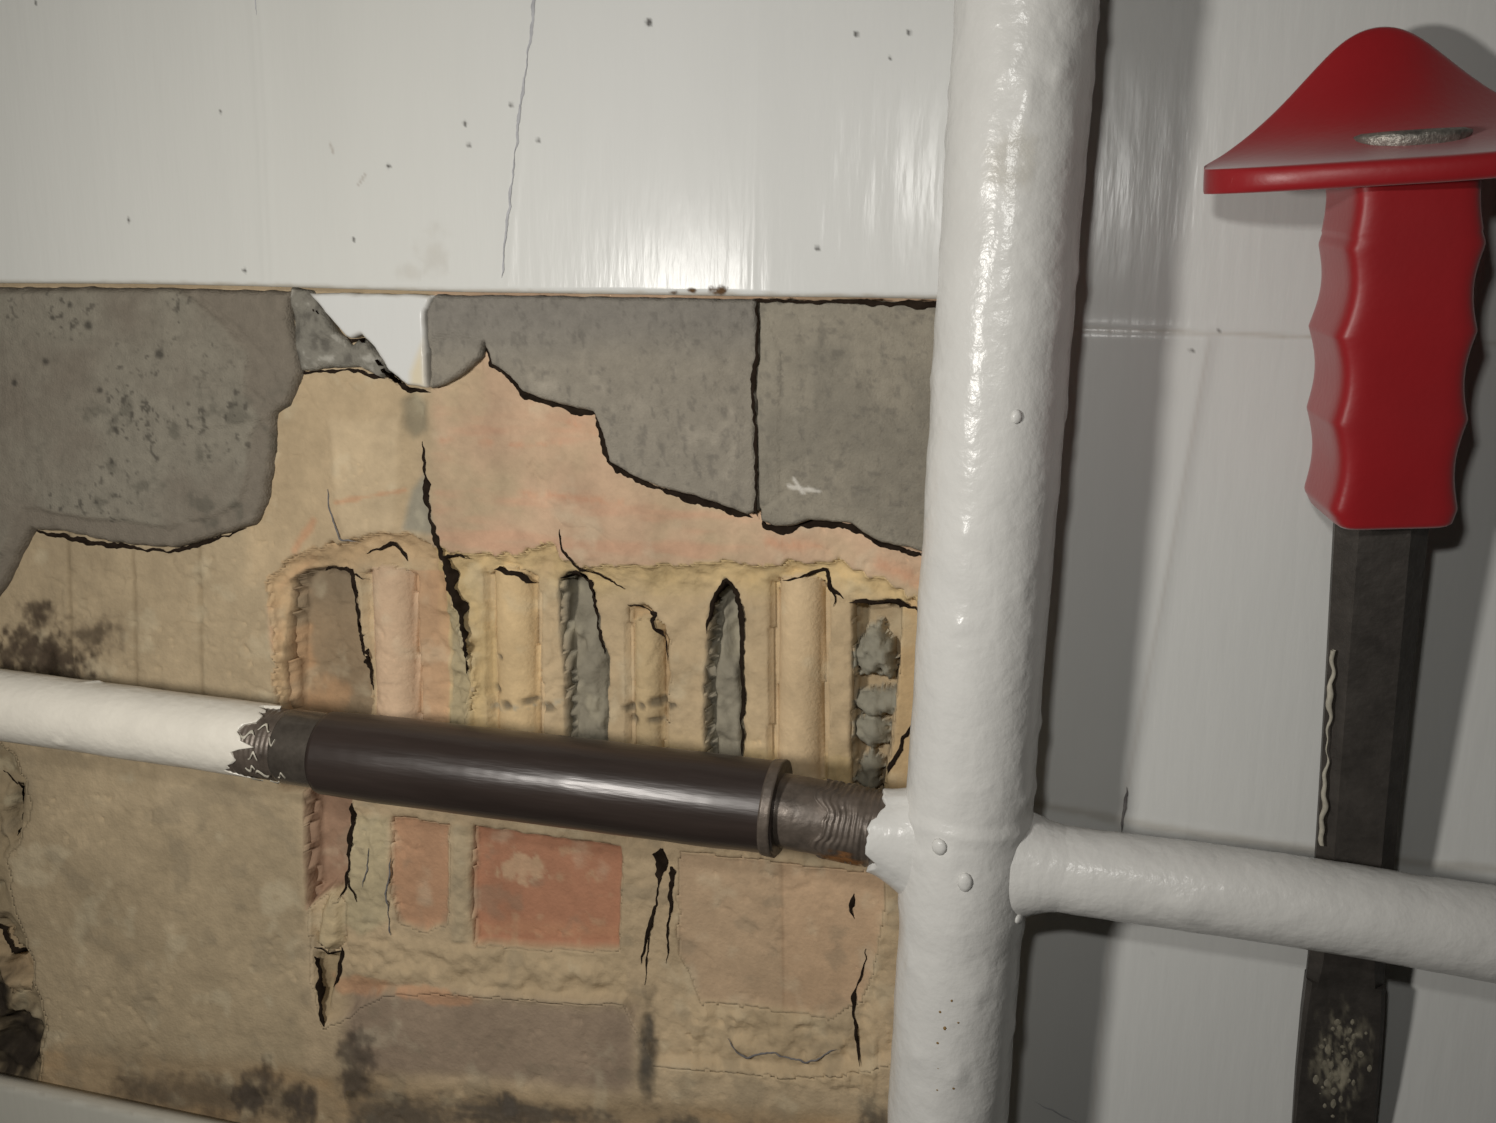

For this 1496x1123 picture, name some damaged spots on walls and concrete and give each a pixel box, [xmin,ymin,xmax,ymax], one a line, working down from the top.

crack [325,442,668,690]
leakage [0,602,103,679]
spalling [265,532,918,789]
crack [706,578,746,755]
peeling [240,723,285,784]
spalling [0,741,48,1081]
crack [314,947,344,1027]
spalling [303,788,899,1080]
crack [641,848,676,985]
leakage [230,1068,316,1123]
leakage [338,1033,371,1097]
leakage [357,1093,576,1123]